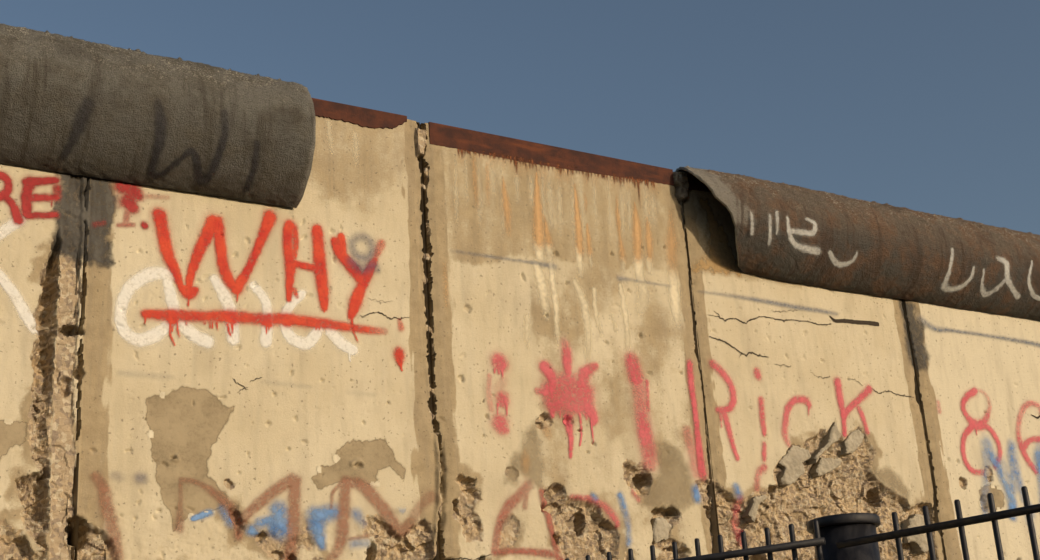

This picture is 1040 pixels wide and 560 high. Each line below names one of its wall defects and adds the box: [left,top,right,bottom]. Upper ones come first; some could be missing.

rust [458,148,655,260]
crack [710,309,879,367]
spalling [0,226,60,560]
spalling [67,519,122,560]
peeling [146,386,327,560]
peeling [312,439,406,489]
spalling [358,513,437,560]
spalling [451,470,523,560]
spalling [503,413,636,560]
spalling [621,420,940,560]
peeling [958,465,1004,513]